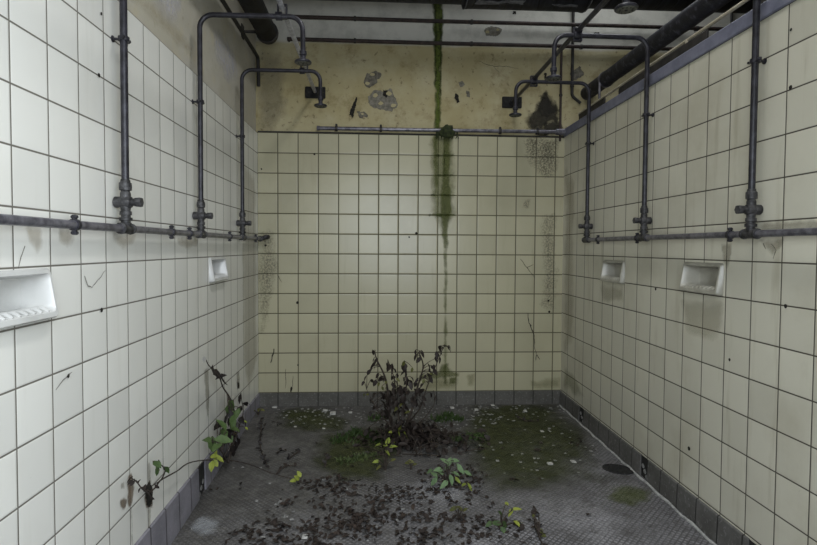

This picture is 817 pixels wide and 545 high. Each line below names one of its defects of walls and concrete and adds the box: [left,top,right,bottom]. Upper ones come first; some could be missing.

flaking render [349,71,398,118]
water stain [527,91,562,130]